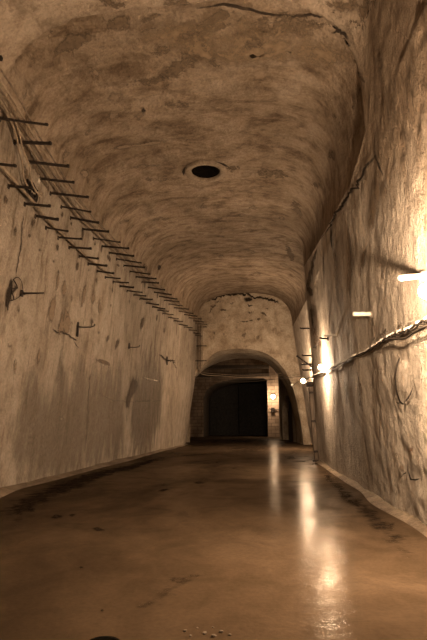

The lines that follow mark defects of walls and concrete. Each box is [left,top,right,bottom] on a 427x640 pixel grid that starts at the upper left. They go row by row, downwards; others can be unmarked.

crack [200,3,350,46]
crack [322,145,383,247]
crack [207,293,278,303]
water stain [16,354,162,477]